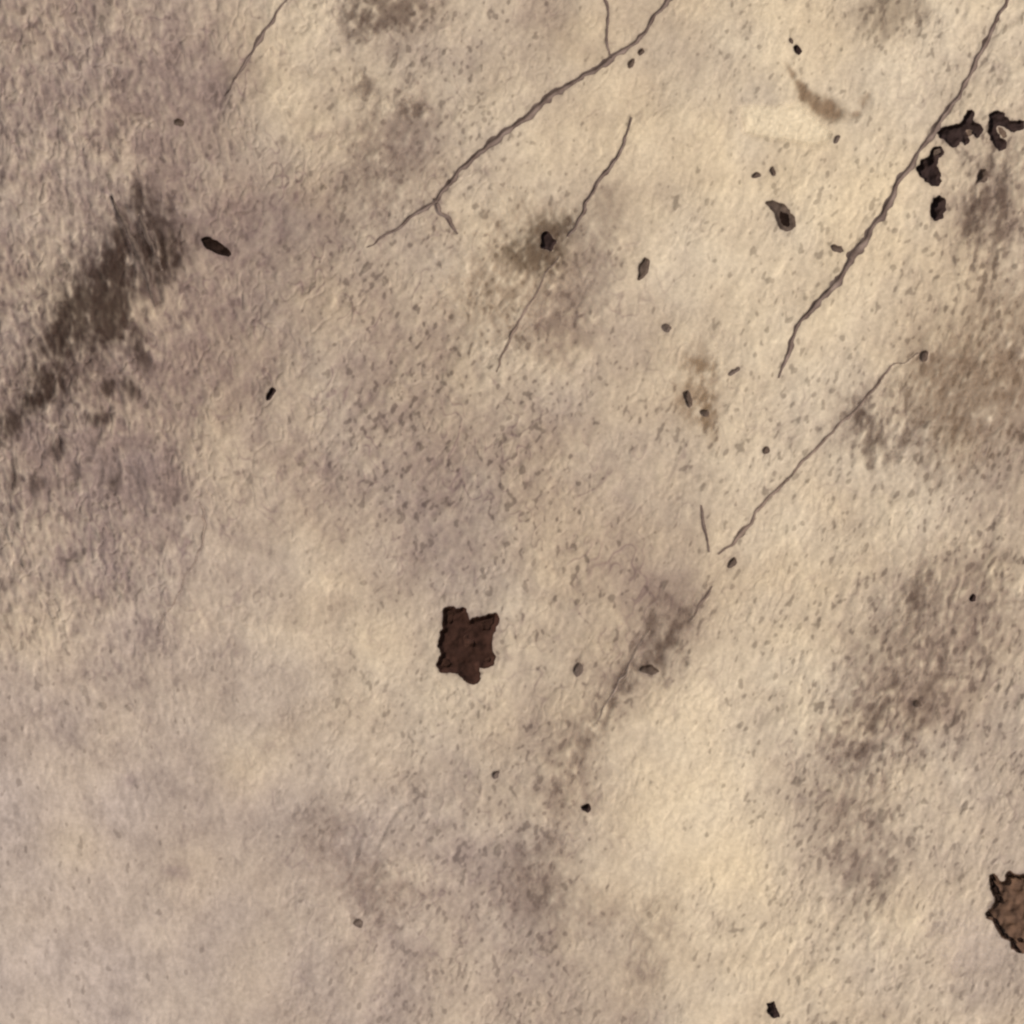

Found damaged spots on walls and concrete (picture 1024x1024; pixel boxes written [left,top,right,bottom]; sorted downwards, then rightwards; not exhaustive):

crack [367,0,672,247]
crack [496,117,632,372]
peeling [765,200,796,231]
crack [778,0,1009,378]
spalling [916,110,1024,221]
crack [700,353,918,555]
spalling [436,606,499,685]
crack [596,628,650,724]
crack [690,586,712,620]
spalling [985,871,1024,954]